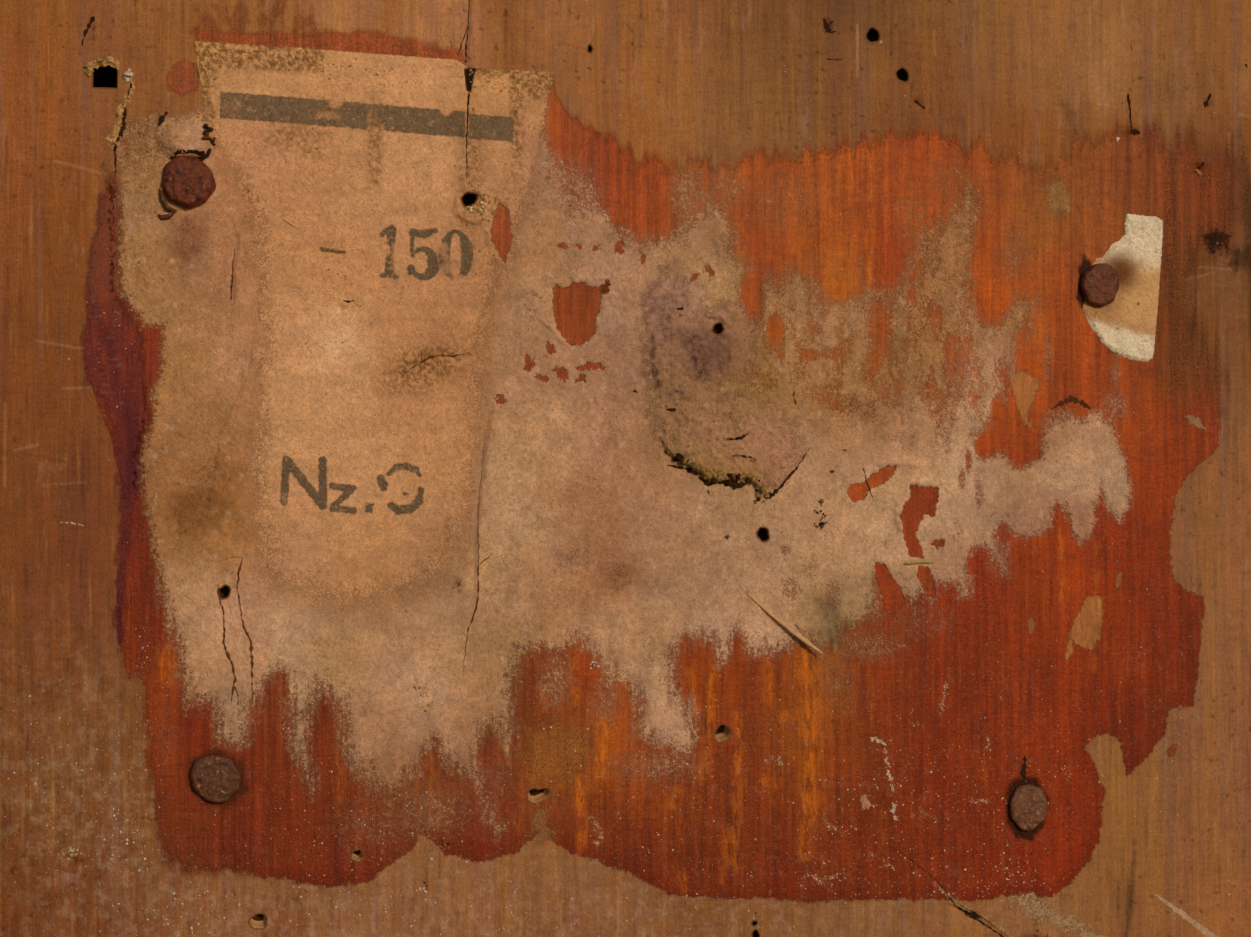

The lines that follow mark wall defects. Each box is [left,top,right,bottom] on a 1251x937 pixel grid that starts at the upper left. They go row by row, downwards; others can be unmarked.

peeling [84,55,134,82]
crack [458,0,470,181]
peeling [201,124,216,146]
peeling [464,201,512,263]
rust [1077,254,1091,309]
peeling [524,280,610,382]
peeling [847,466,896,502]
peeling [900,485,945,597]
peeling [875,563,905,615]
crack [218,557,254,705]
spalling [1065,595,1103,660]
rust [1006,777,1048,840]